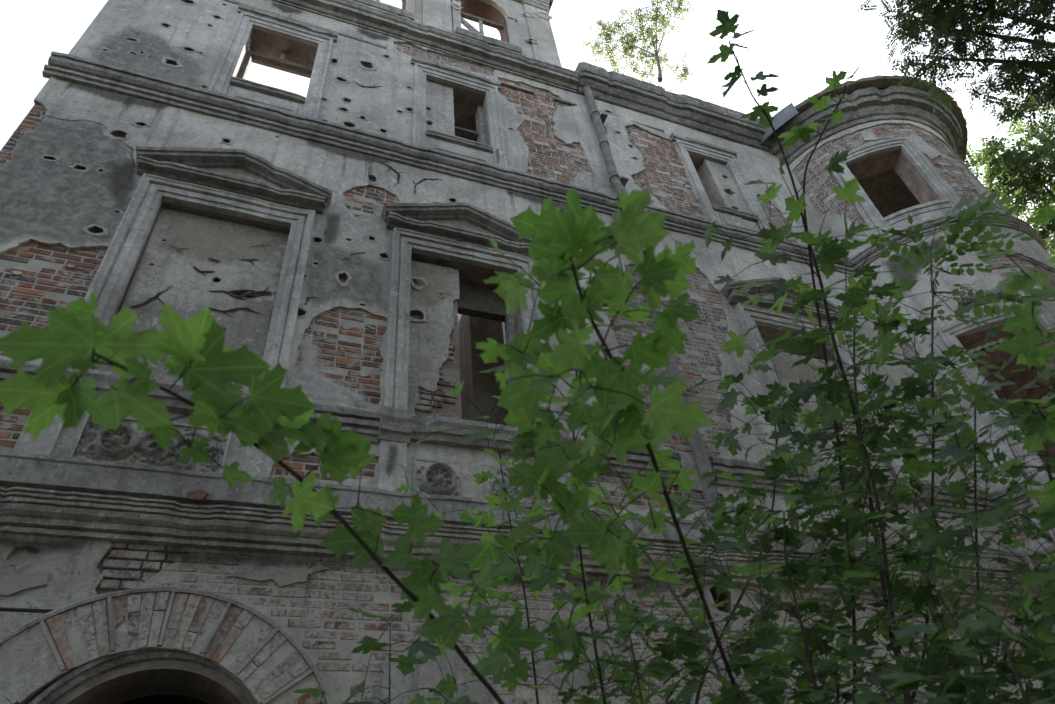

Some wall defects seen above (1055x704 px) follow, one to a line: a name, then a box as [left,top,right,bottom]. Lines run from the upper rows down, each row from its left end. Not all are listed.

spalling [330,57,351,82]
spalling [321,96,389,134]
spalling [358,43,593,185]
flaking render [0,102,151,357]
spalling [342,172,398,217]
spalling [613,126,704,219]
crack [130,284,172,308]
crack [170,244,275,317]
spalling [295,235,390,410]
spalling [415,326,458,418]
spalling [0,402,32,451]
spalling [99,542,1055,704]